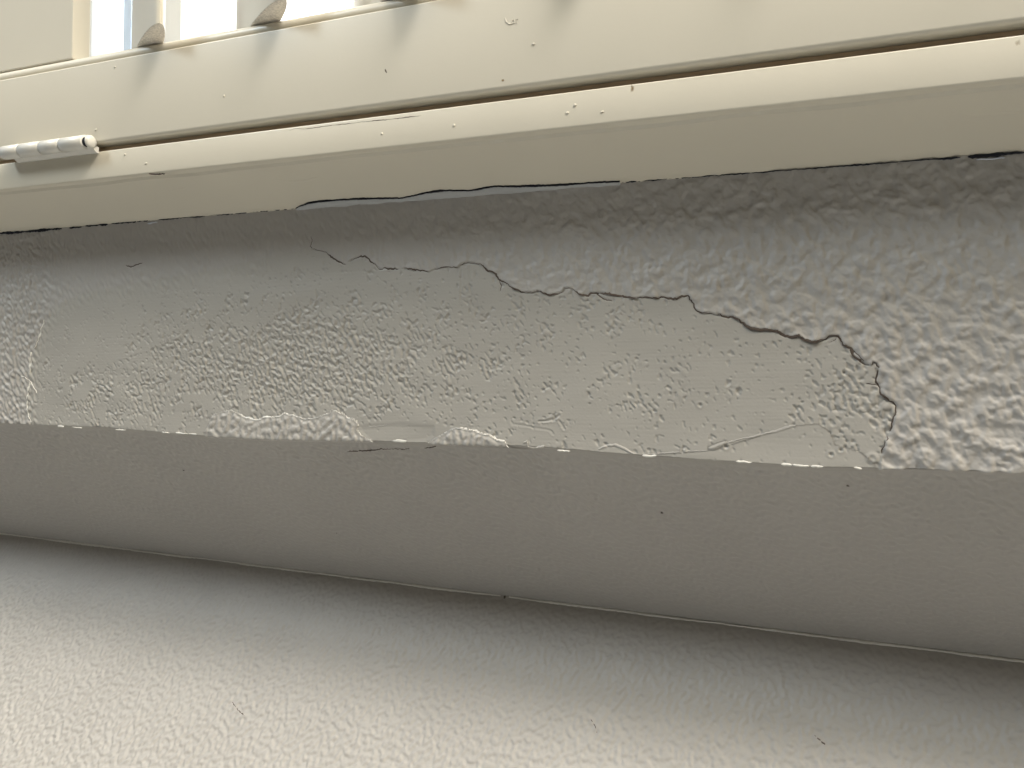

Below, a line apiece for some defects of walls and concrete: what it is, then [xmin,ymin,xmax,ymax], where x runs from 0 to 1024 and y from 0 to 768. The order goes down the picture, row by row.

crack [0,152,1024,235]